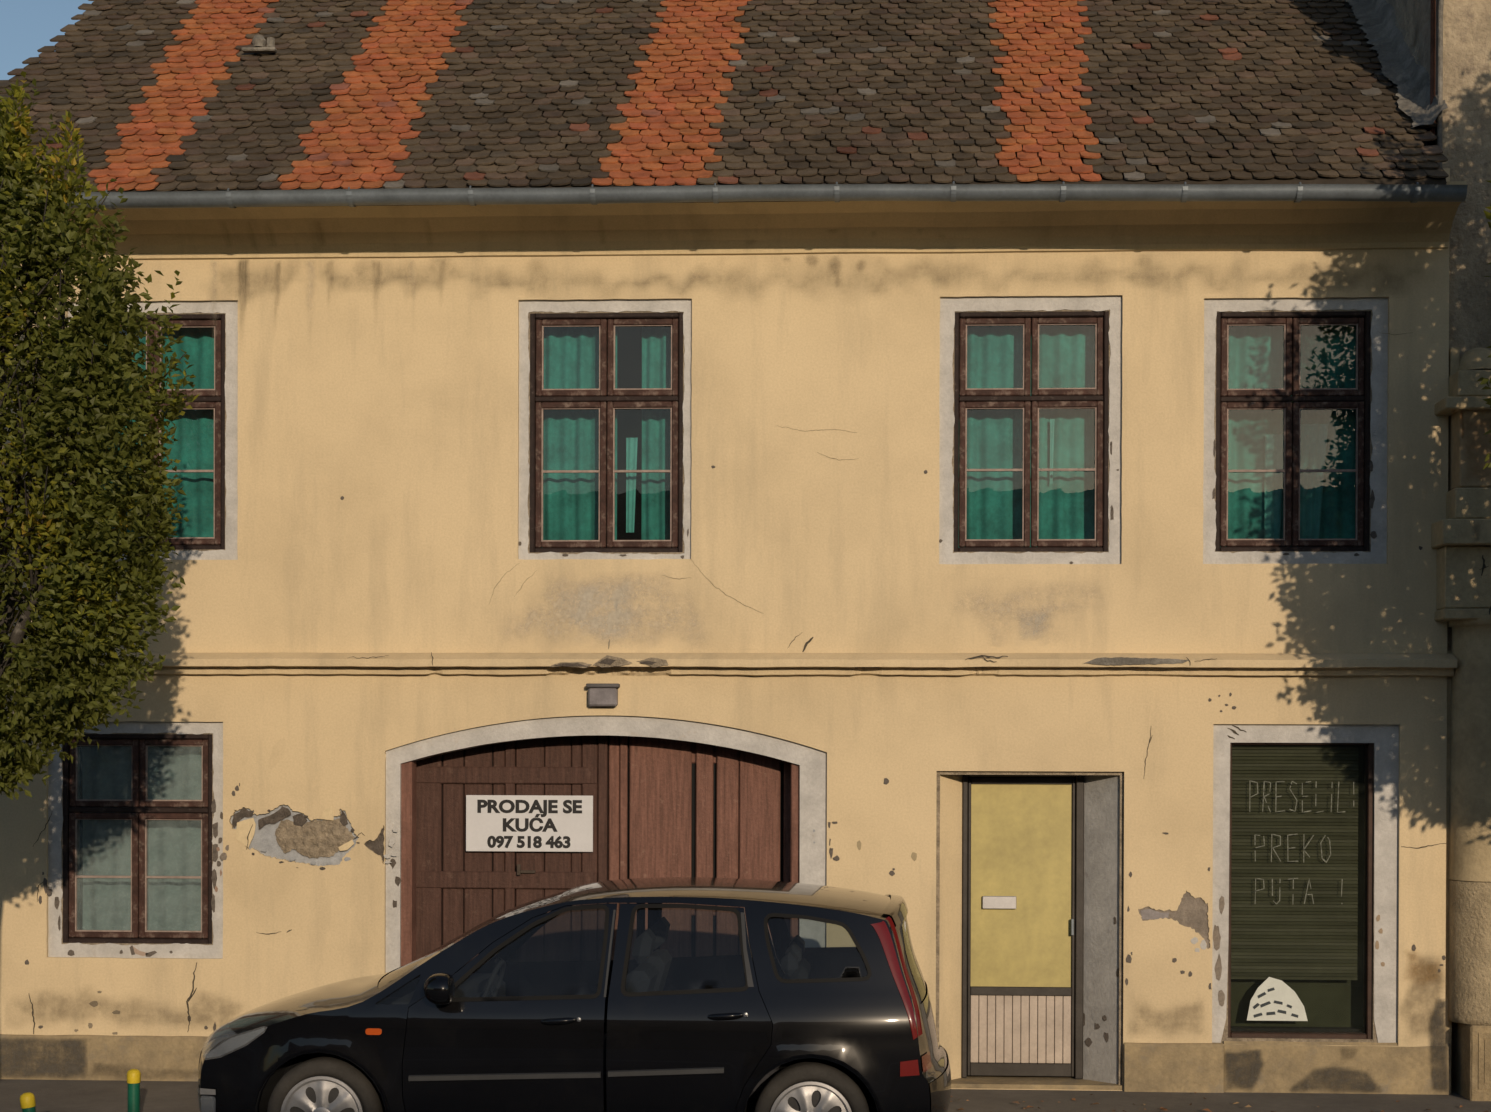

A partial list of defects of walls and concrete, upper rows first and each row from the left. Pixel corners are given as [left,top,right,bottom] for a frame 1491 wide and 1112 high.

spalling [211,783,401,925]
crack [186,962,197,1031]
peeling [1083,1013,1109,1047]
peeling [1114,891,1225,1006]